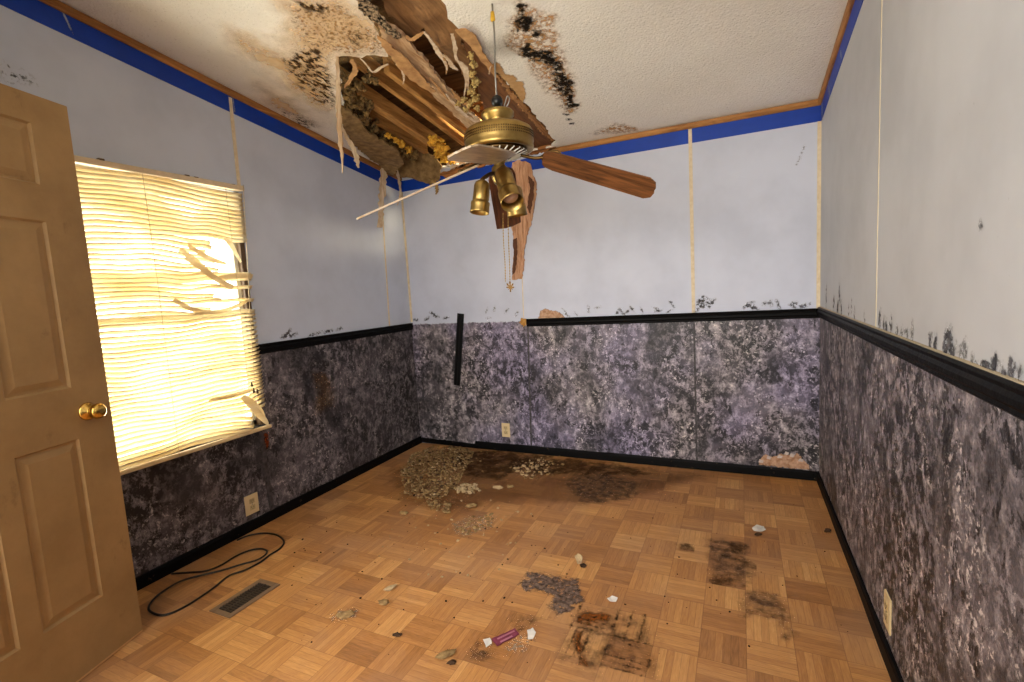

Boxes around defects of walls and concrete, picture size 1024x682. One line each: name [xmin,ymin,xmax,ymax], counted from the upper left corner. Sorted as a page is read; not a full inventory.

damp [258,1,381,103]
damp [506,3,580,125]
peeling [539,309,565,318]
damp [456,450,643,502]
peeling [759,451,810,470]
damp [711,542,748,585]
damp [572,606,646,666]